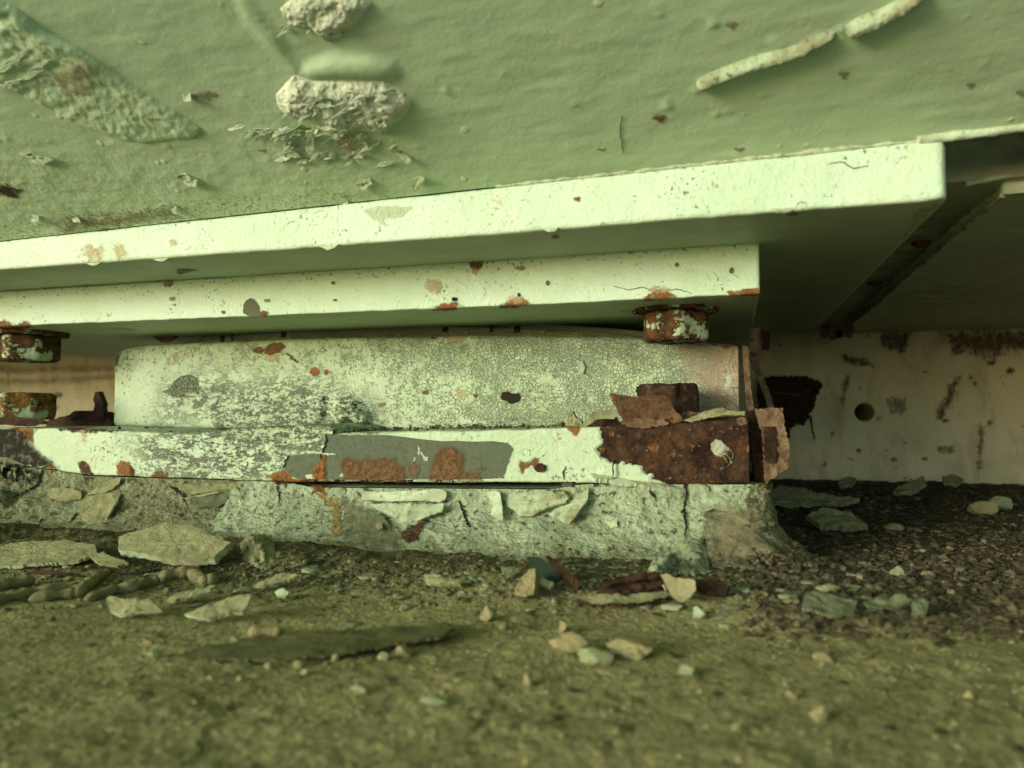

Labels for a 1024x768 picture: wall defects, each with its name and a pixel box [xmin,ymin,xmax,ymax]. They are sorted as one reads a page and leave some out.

peeling [0,0,218,144]
peeling [227,88,411,191]
peeling [162,374,199,398]
corrosion [253,342,286,362]
corrosion [340,448,482,483]
corrosion [610,393,682,423]
corrosion [762,426,778,464]
peeling [0,434,669,622]
spalling [526,482,794,621]
crack [681,483,712,567]